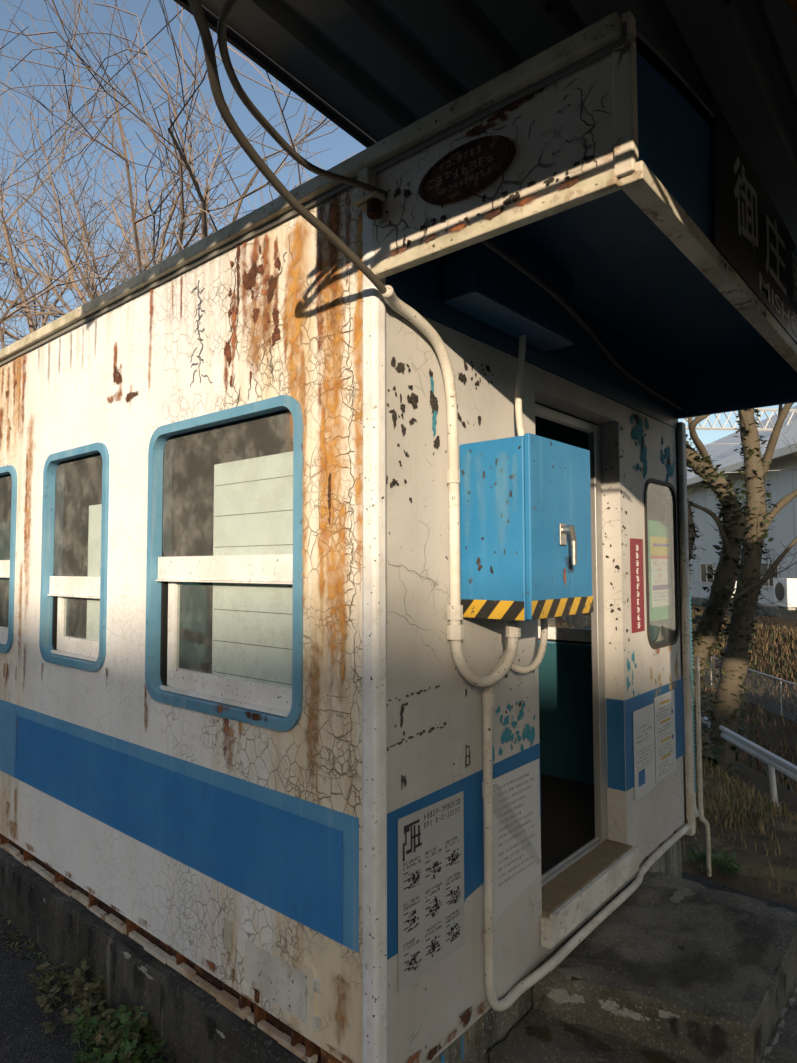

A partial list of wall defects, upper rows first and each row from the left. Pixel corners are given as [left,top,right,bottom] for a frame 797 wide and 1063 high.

peeling [466,87,544,137]
crack [398,87,613,232]
peeling [498,155,595,215]
crack [190,244,292,421]
peeling [458,360,493,389]
peeling [386,357,440,488]
corrosion [0,357,32,690]
corrosion [217,193,363,772]
peeling [492,697,535,769]
corrosion [328,977,352,1063]
corrosion [406,1003,484,1063]
water stain [547,988,728,1059]